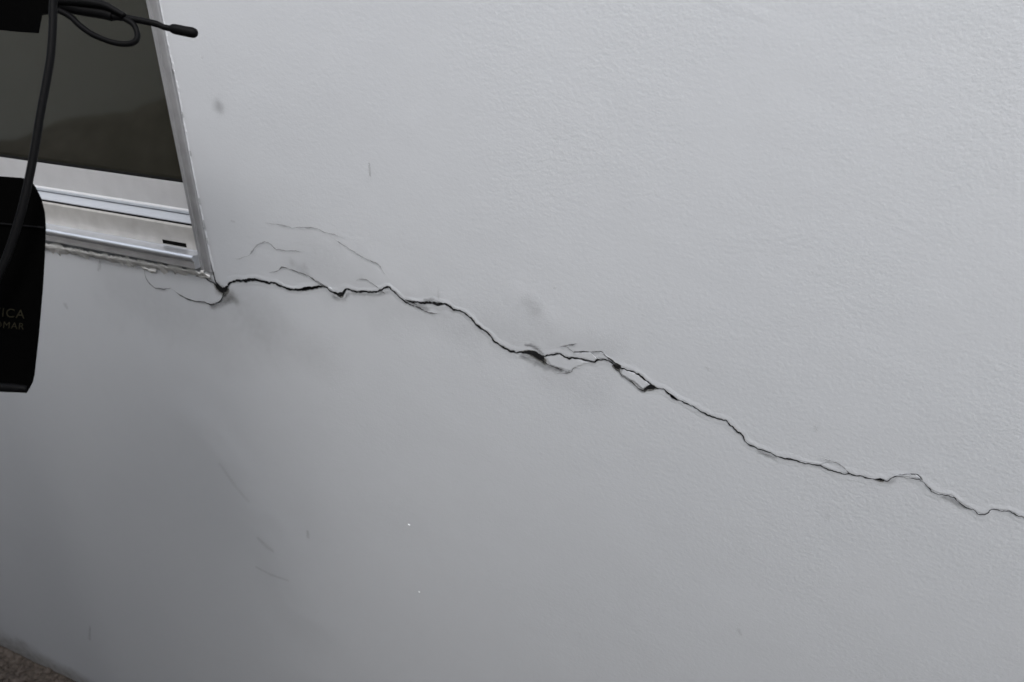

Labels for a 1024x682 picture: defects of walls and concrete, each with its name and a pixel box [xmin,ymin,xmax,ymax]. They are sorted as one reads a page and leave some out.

crack [145,225,1024,524]